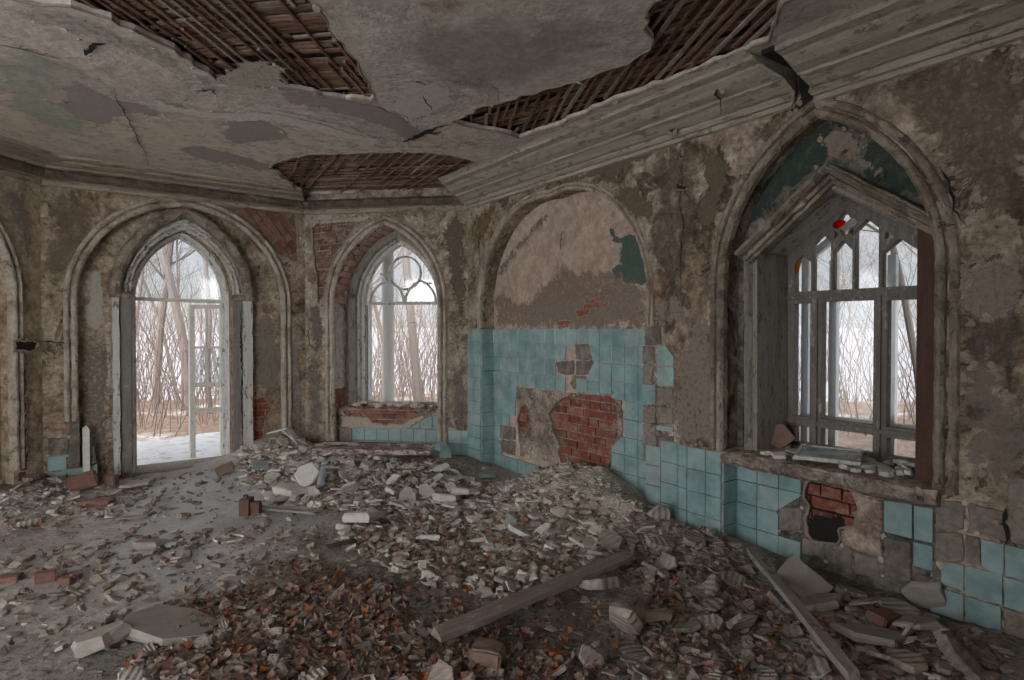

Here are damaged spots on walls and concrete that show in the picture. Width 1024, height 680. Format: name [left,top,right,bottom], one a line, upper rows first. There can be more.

crack [113,89,150,165]
flaking render [12,0,477,195]
flaking render [450,0,835,139]
peeling [747,121,923,229]
spalling [219,205,395,350]
peeling [610,228,646,286]
flaking render [253,314,281,441]
spalling [499,344,623,470]
peeling [778,476,1024,586]
peeling [1003,607,1024,639]